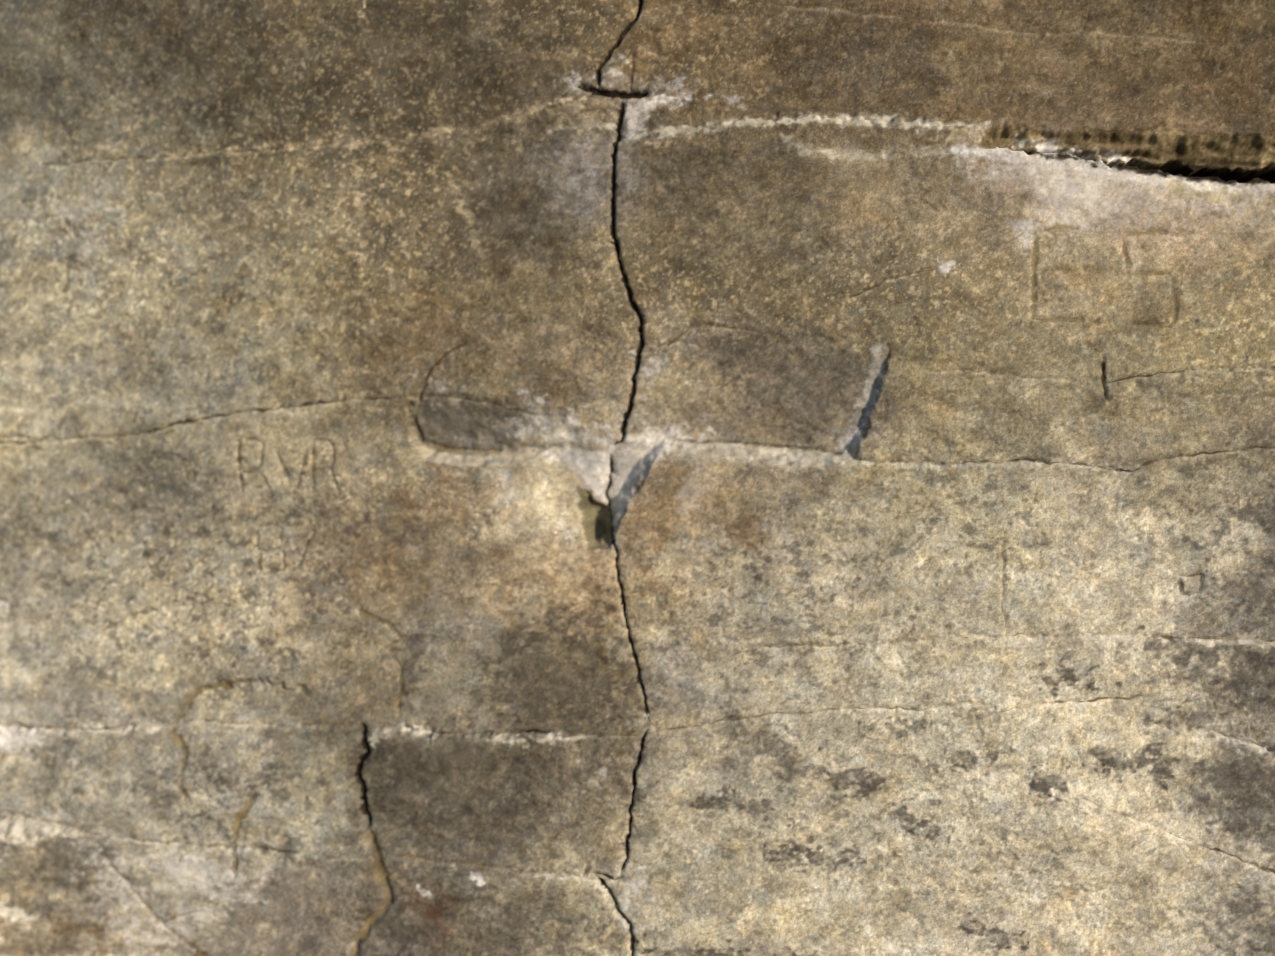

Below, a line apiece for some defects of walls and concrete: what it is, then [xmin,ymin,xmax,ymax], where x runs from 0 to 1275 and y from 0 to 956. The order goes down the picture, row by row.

crack [149,400,331,433]
crack [0,435,44,444]
crack [578,0,767,956]
crack [354,605,403,722]
crack [1055,695,1135,703]
crack [516,727,554,735]
crack [309,723,426,956]